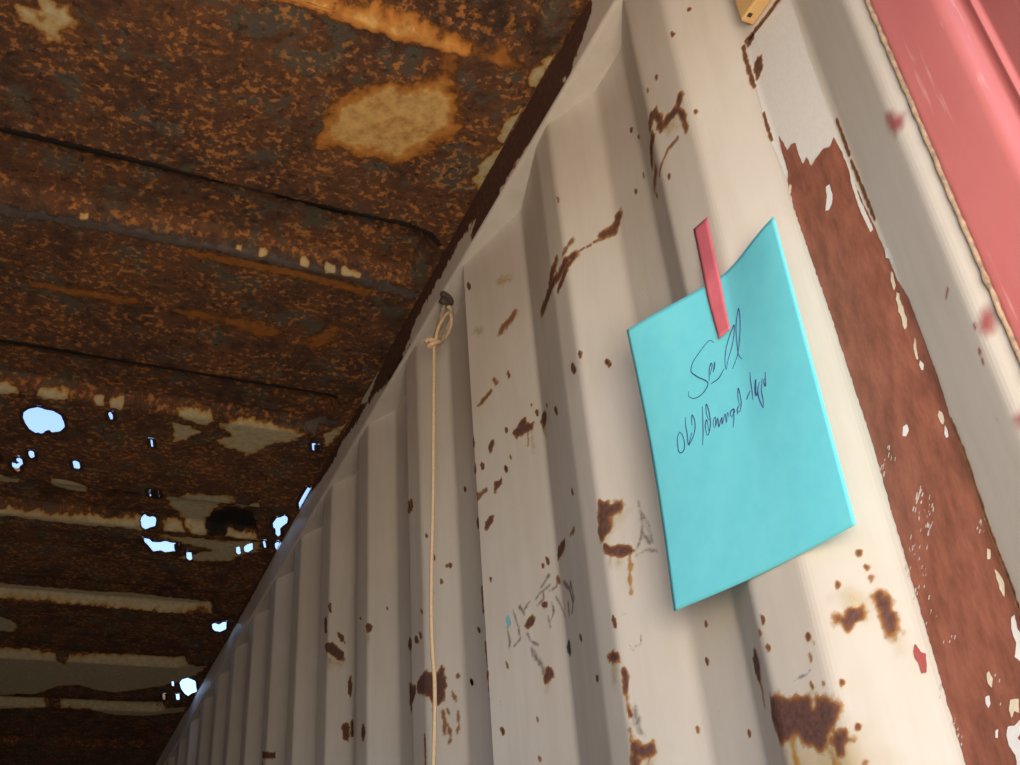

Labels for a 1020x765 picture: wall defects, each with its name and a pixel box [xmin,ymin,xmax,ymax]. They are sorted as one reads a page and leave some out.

corrosion [0,127,223,183]
corrosion [630,91,698,198]
corrosion [173,0,592,710]
corrosion [597,499,634,595]
corrosion [832,549,900,640]
peeling [1011,615,1020,661]
corrosion [341,719,366,742]
corrosion [409,665,474,744]
corrosion [607,650,657,765]
corrosion [752,615,862,765]
peeling [985,671,993,708]
peeling [995,699,1020,765]